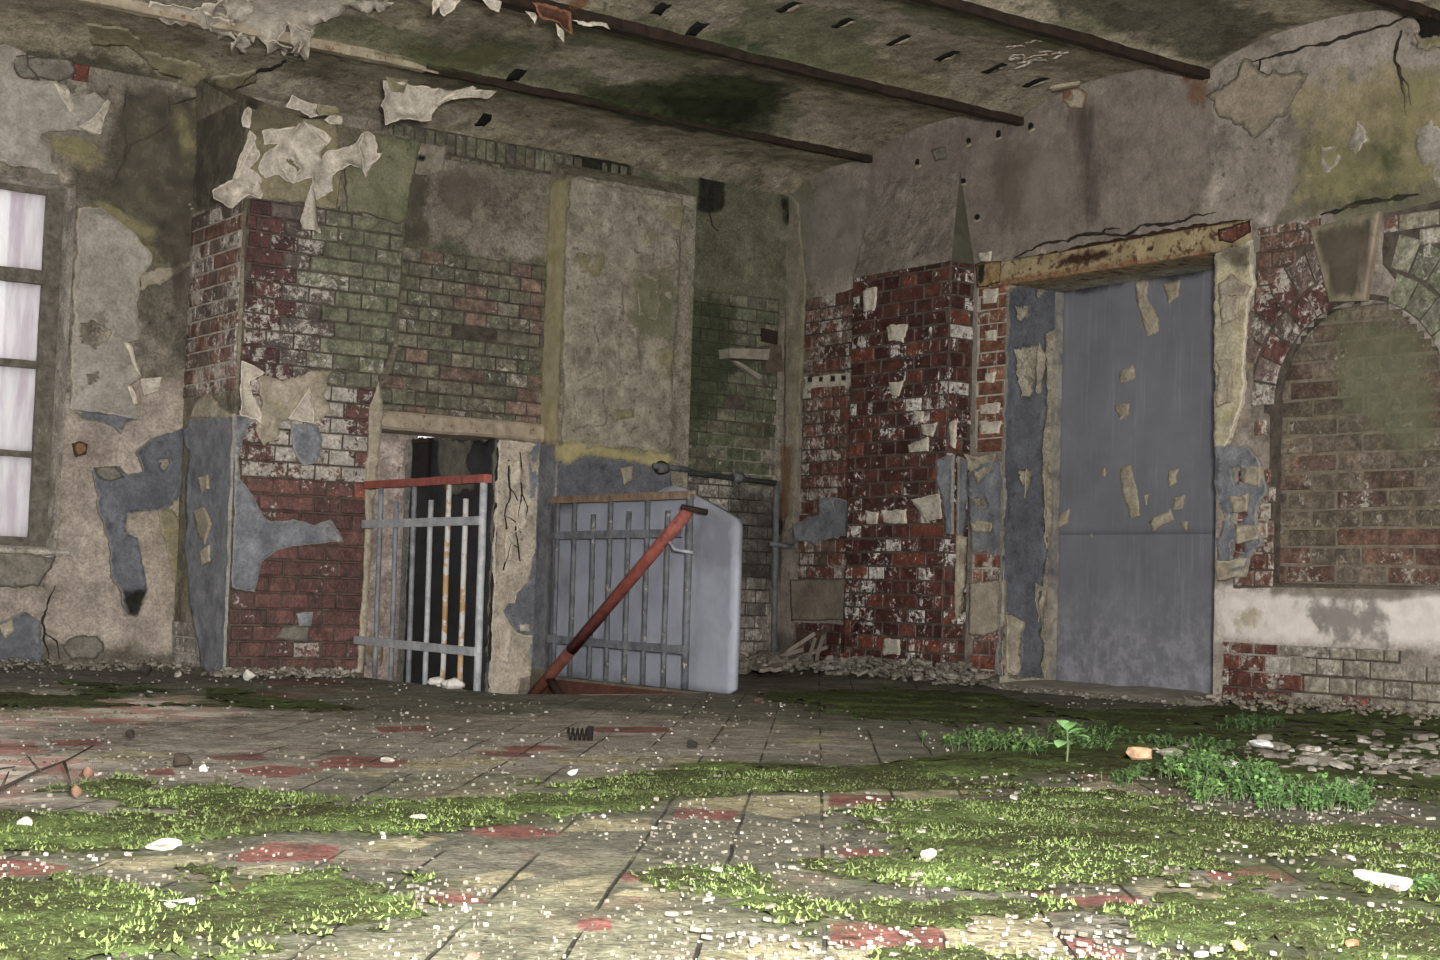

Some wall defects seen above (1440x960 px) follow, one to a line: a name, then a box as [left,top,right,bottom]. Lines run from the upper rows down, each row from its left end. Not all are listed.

peeling [87,0,395,91]
peeling [432,0,461,16]
peeling [573,20,610,29]
crack [1249,16,1411,116]
peeling [212,77,497,233]
peeling [69,207,191,434]
corrosion [975,261,1001,288]
crack [1013,212,1216,258]
corrosion [1018,219,1252,265]
peeling [865,239,1268,680]
peeling [91,361,344,674]
crack [488,440,528,691]